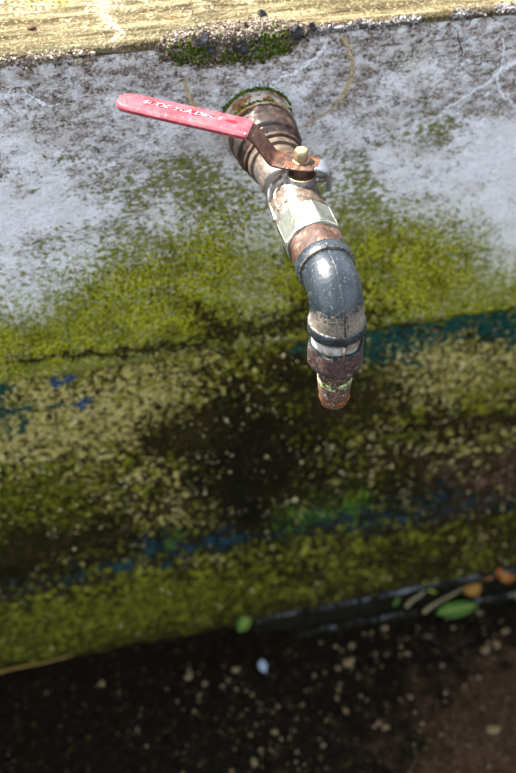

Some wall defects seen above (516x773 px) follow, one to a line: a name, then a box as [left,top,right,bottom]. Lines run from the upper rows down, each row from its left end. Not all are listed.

water stain [222,46,326,138]
water stain [445,38,516,109]
water stain [129,282,516,596]